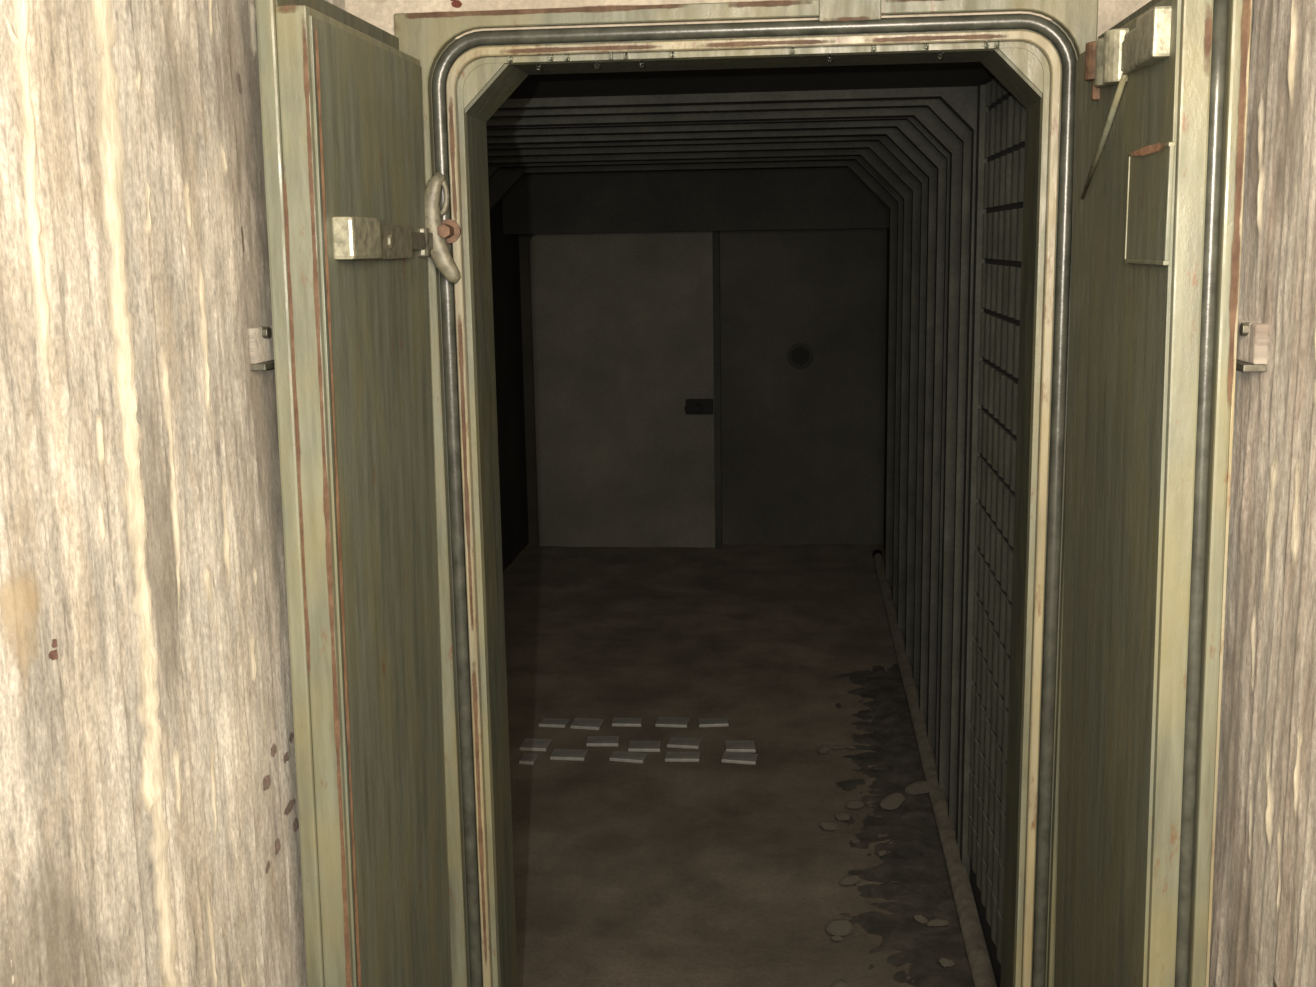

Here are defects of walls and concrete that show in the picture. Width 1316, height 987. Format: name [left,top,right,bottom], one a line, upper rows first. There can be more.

rust [407,0,680,18]